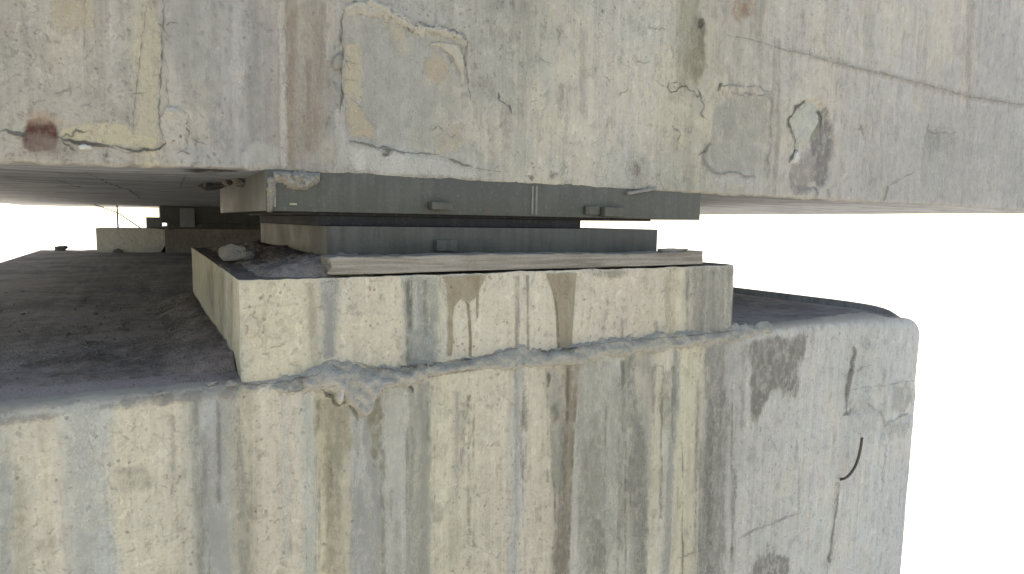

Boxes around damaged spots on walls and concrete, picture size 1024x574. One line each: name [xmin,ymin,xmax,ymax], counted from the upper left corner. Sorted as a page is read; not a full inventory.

crack [1,129,27,137]
corrosion [23,118,58,153]
crack [52,0,177,199]
peeling [331,0,501,172]
crack [667,82,706,119]
spalling [788,100,832,198]
water stain [403,275,486,364]
water stain [547,272,577,348]
water stain [547,336,807,574]